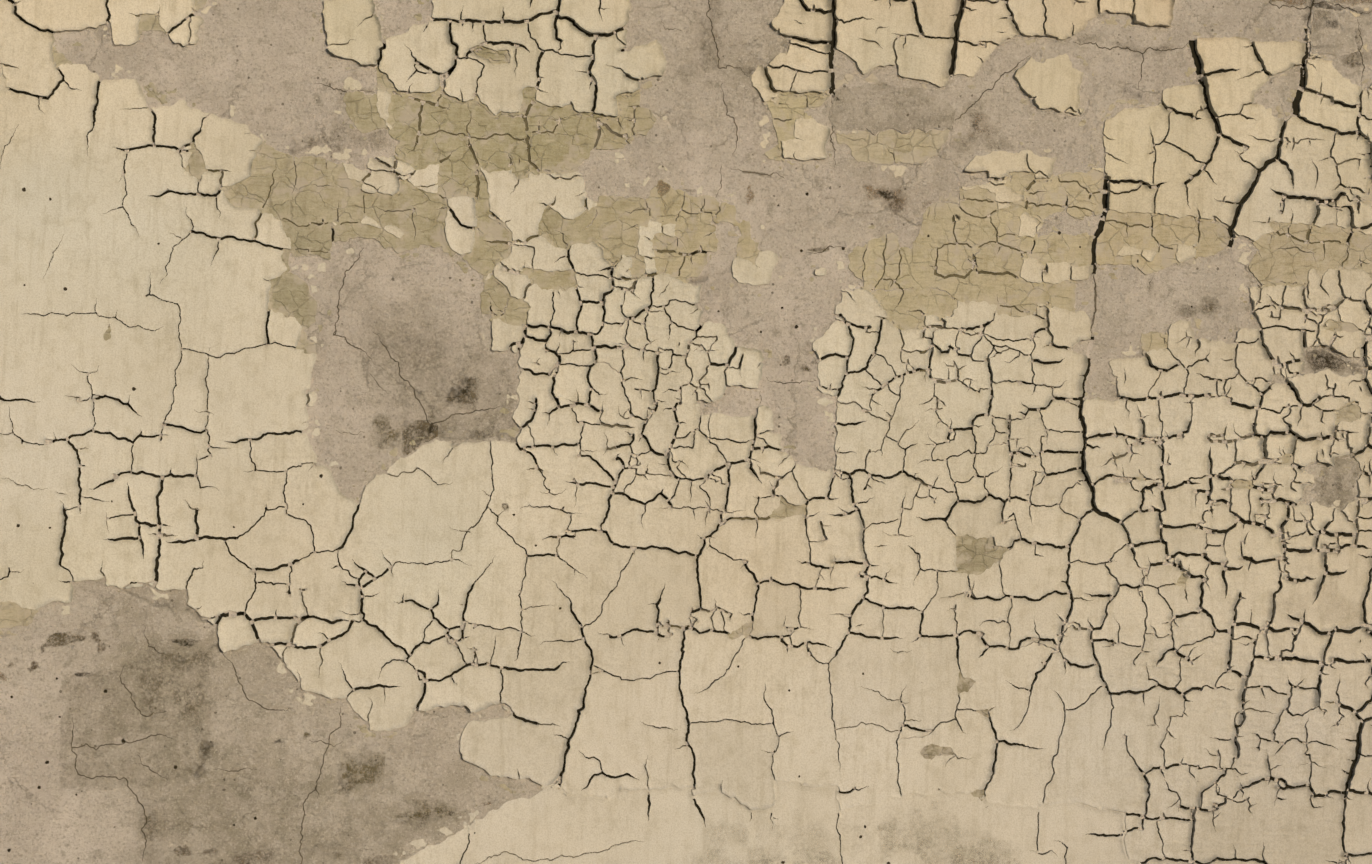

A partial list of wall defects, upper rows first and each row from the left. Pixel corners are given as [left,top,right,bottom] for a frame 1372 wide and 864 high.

crack [0,64,101,169]
crack [104,107,207,235]
crack [150,165,283,283]
peeling [0,0,558,355]
crack [407,0,640,198]
crack [706,0,1018,153]
peeling [451,0,1372,632]
crack [931,177,1040,279]
crack [1058,23,1324,340]
crack [1271,43,1372,260]
peeling [0,63,729,864]
crack [52,230,1372,864]